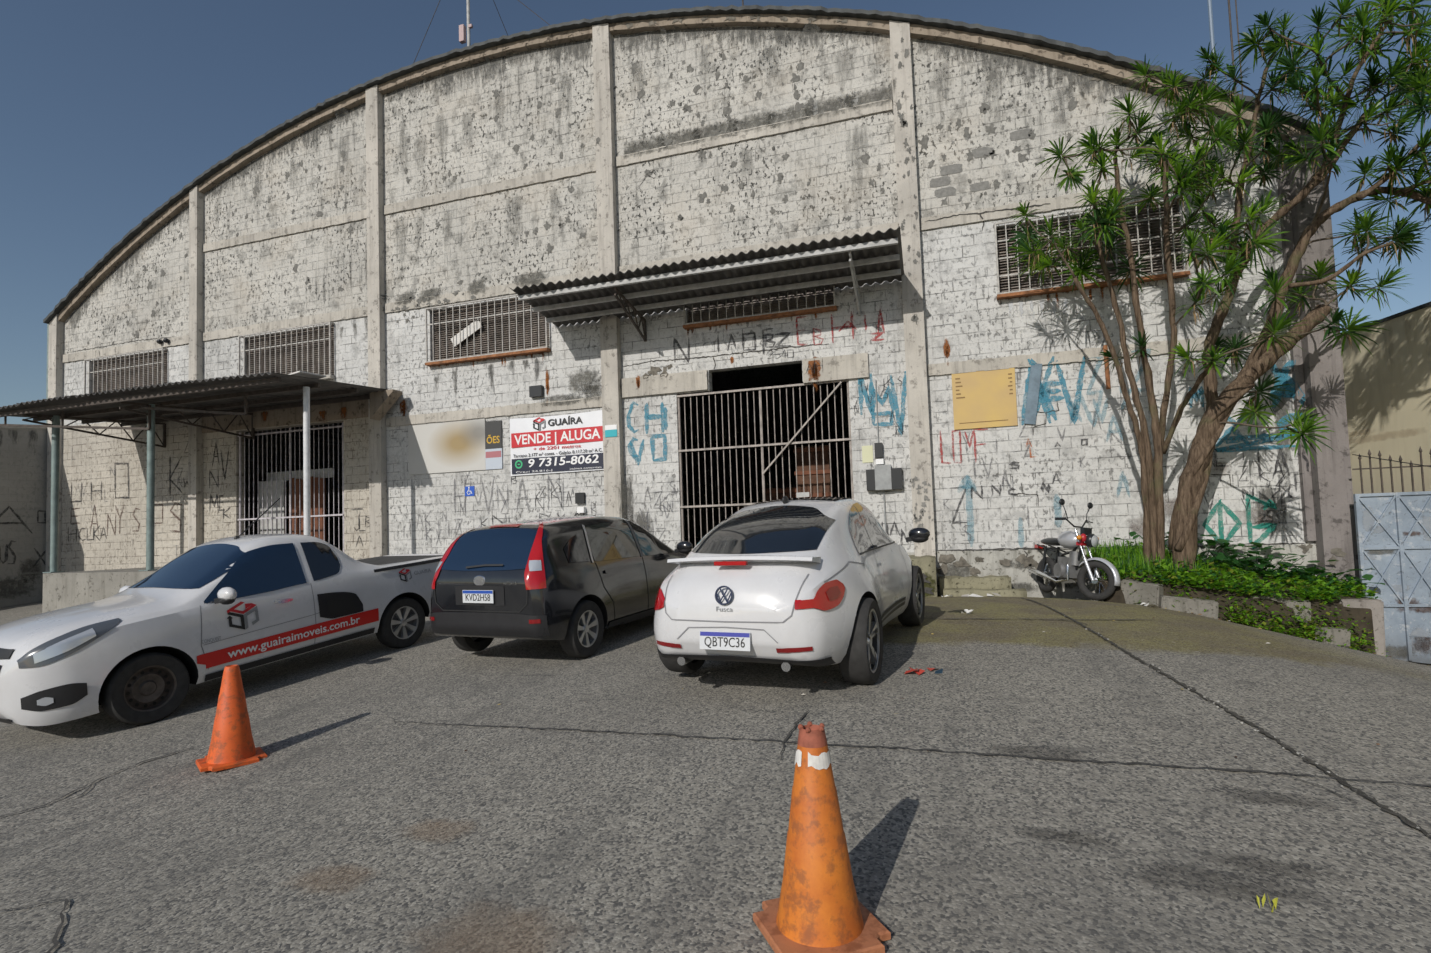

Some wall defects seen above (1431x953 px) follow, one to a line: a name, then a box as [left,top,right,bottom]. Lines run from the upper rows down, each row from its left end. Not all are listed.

leakage [624,80,895,157]
corrosion [1386,647,1408,658]
crack [0,746,195,817]
crack [0,898,69,953]